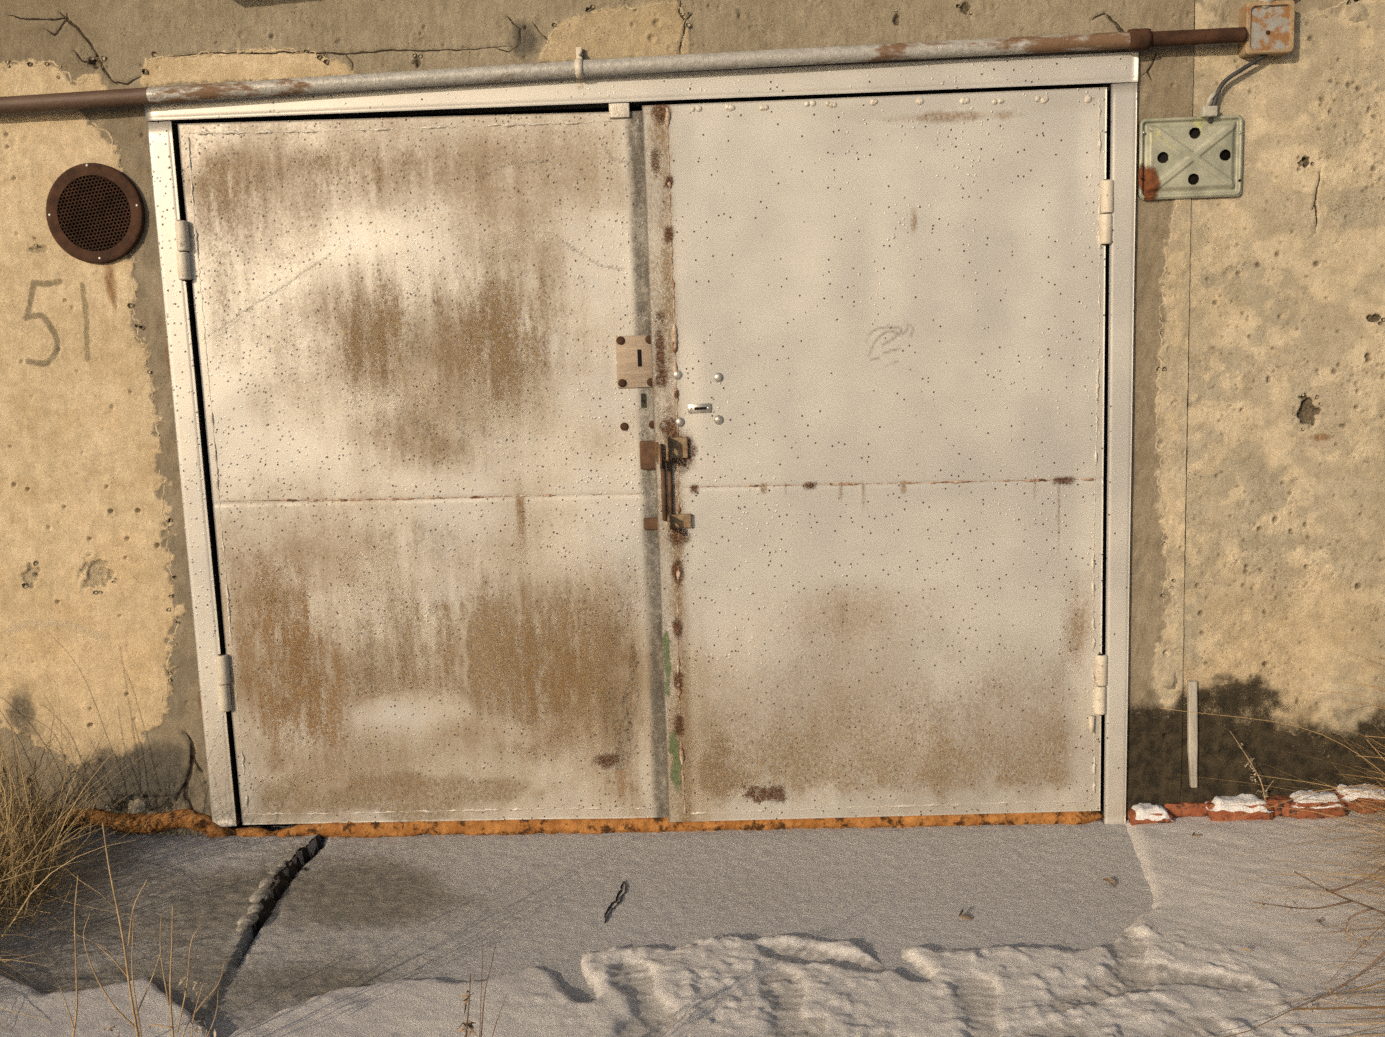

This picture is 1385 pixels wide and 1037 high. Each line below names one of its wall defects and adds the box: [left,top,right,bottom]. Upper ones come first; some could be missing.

rust [1151,27,1247,47]
rust [0,87,150,114]
rust [336,272,418,379]
rust [435,275,549,396]
rust [650,105,1065,822]
rust [238,561,375,761]
rust [390,586,637,797]
flaking render [104,795,173,813]
rust [266,774,517,819]